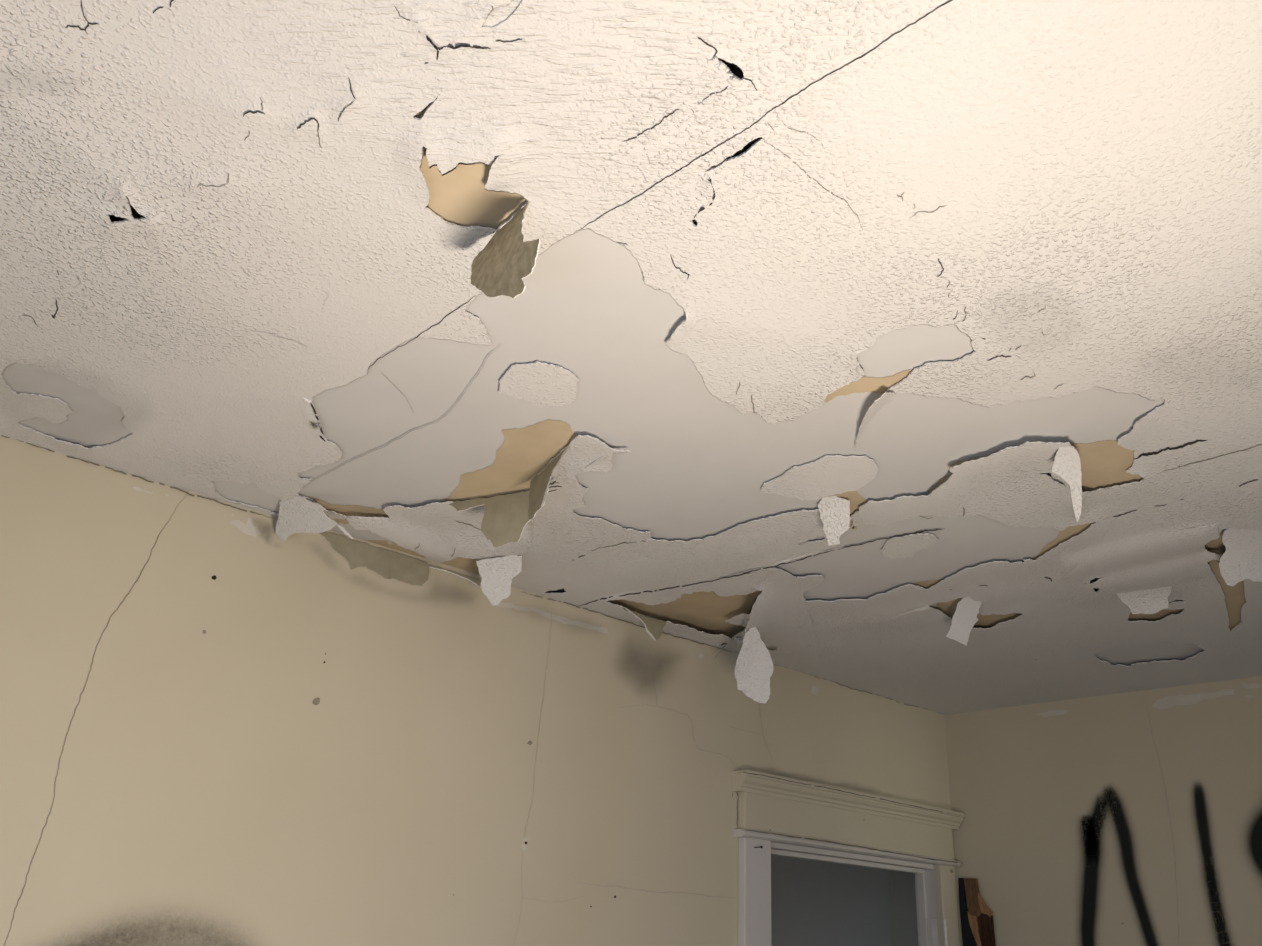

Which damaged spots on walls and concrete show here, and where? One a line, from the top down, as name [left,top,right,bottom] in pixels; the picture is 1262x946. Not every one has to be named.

crack [394,6,522,64]
crack [574,0,953,233]
peeling [2,363,132,448]
crack [303,296,500,488]
peeling [296,229,1164,654]
crack [1133,440,1262,471]
crack [1,435,274,946]
peeling [1094,641,1204,666]
peeling [1128,600,1183,621]
peeling [1205,529,1246,631]